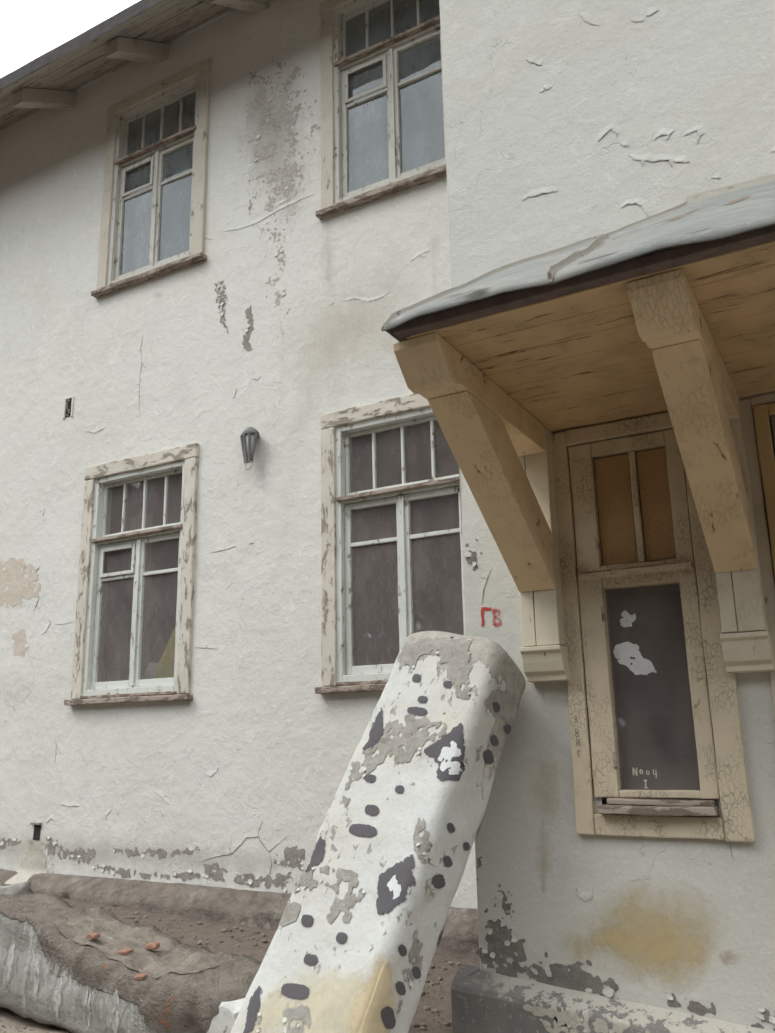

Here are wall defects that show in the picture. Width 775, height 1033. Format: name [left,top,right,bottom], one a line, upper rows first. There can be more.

peeling [240,56,320,314]
crack [205,193,314,240]
peeling [214,281,229,334]
peeling [242,305,254,351]
peeling [0,558,41,608]
peeling [0,837,21,849]
crack [199,819,289,876]
peeling [45,835,366,927]
peeling [476,884,619,999]
peeling [523,1000,650,1033]
peeling [666,993,716,1016]
peeling [751,1007,775,1031]